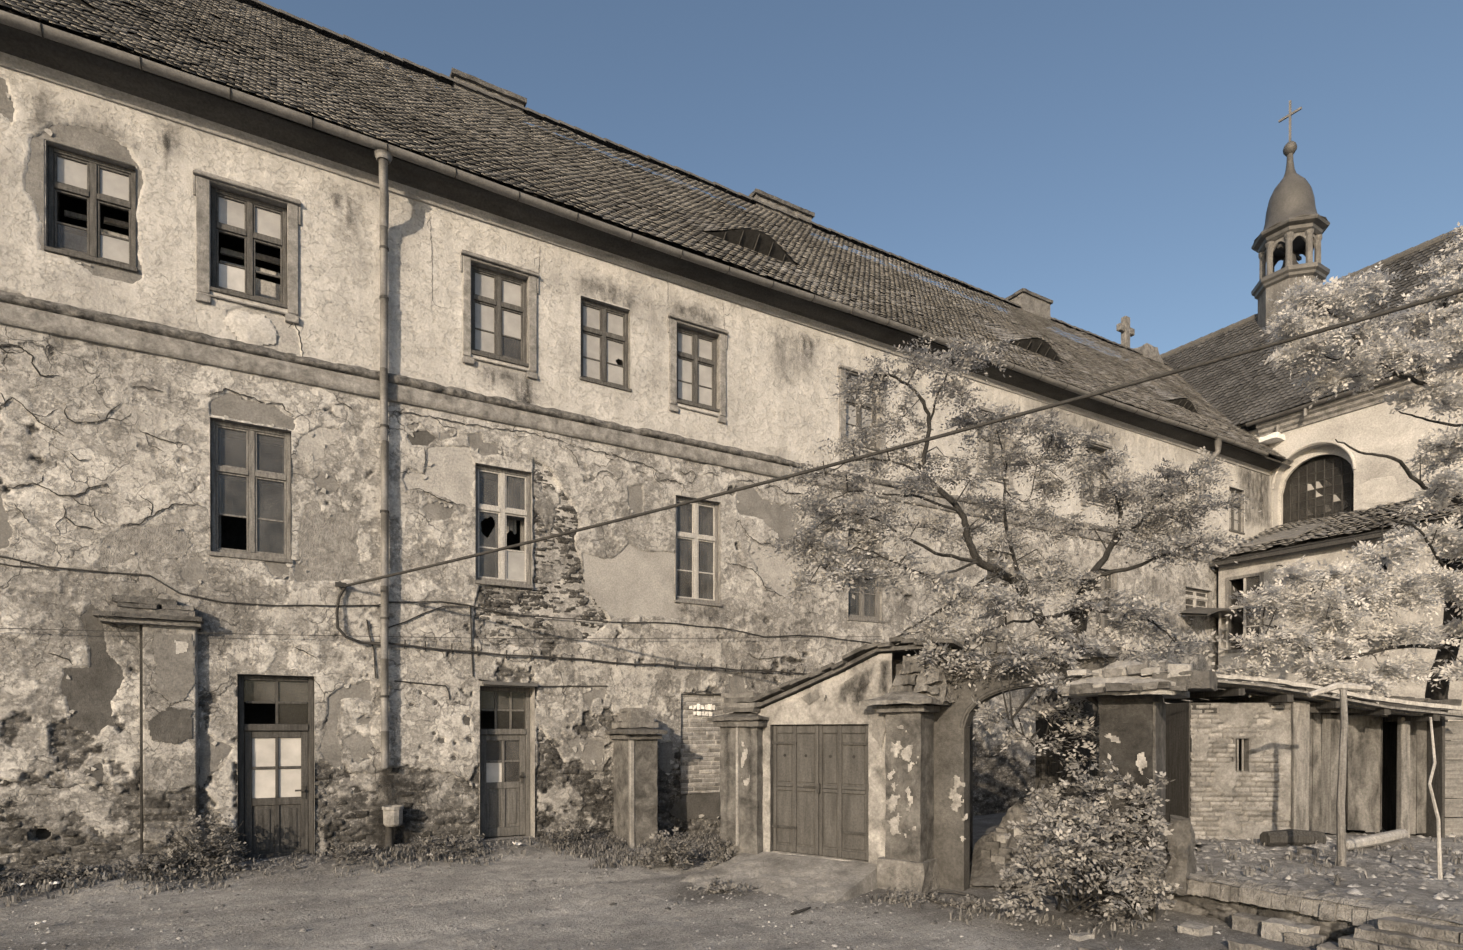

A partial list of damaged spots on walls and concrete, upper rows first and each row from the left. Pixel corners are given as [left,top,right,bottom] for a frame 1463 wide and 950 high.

spalling [0,78,15,122]
crack [0,343,198,536]
spalling [403,420,504,520]
flaking render [474,461,687,649]
crack [392,411,806,602]
spalling [736,482,831,596]
flaking render [0,762,140,875]
spalling [61,604,125,735]
spalling [148,633,232,789]
flaking render [316,681,478,856]
flaking render [536,729,610,835]
spalling [668,792,721,820]